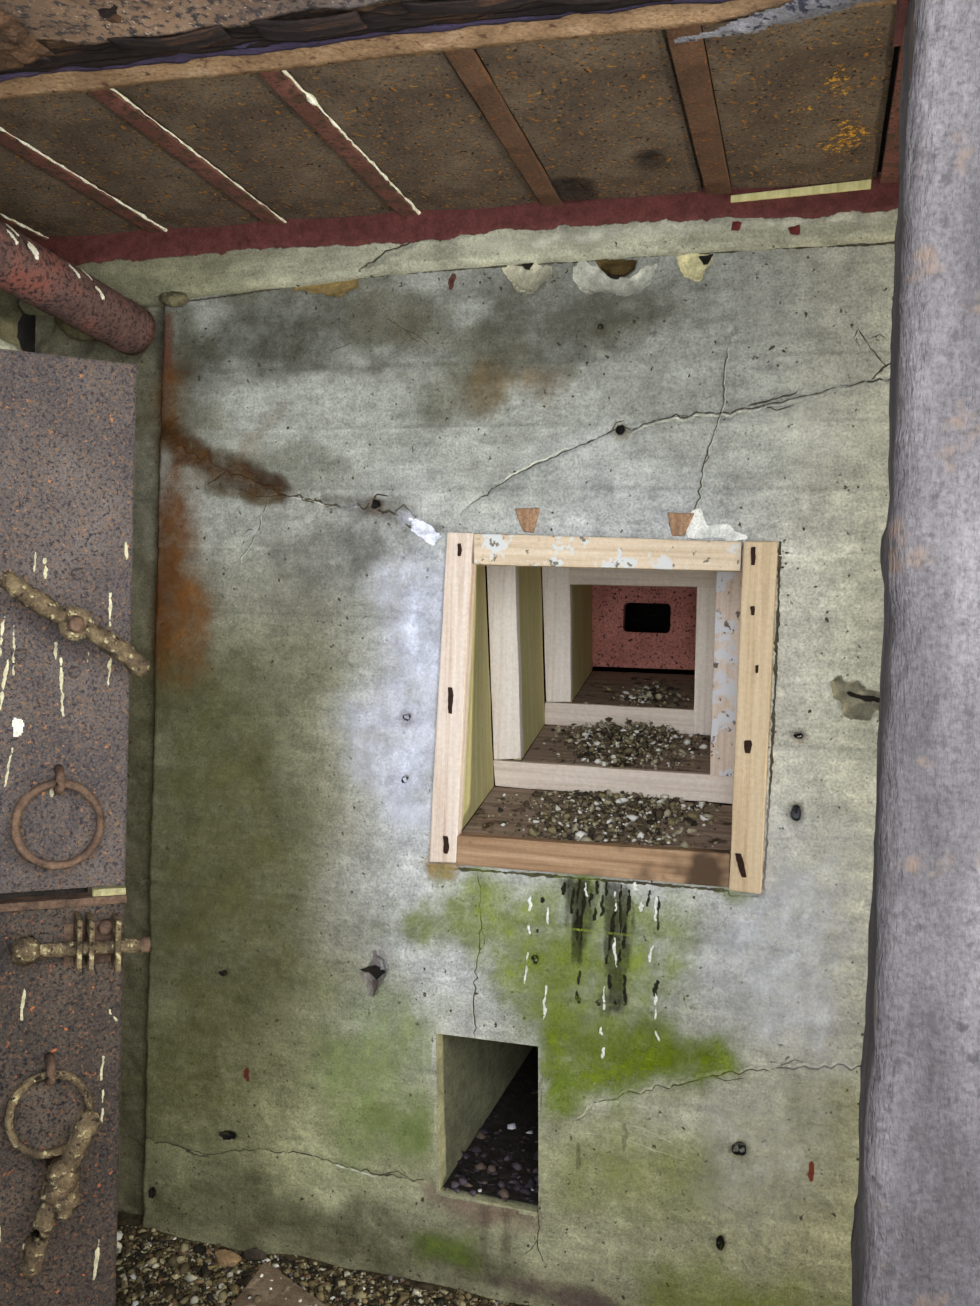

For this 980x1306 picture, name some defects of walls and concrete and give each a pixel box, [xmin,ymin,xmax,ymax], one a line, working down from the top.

corrosion [818,114,874,159]
peeling [35,173,900,266]
spalling [571,259,658,297]
spalling [676,253,713,282]
crack [470,330,890,510]
corrosion [155,357,286,685]
crack [208,481,439,560]
spalling [830,675,880,721]
water stain [527,895,549,934]
water stain [561,879,661,1010]
water stain [652,980,660,1041]
crack [151,1138,427,1182]